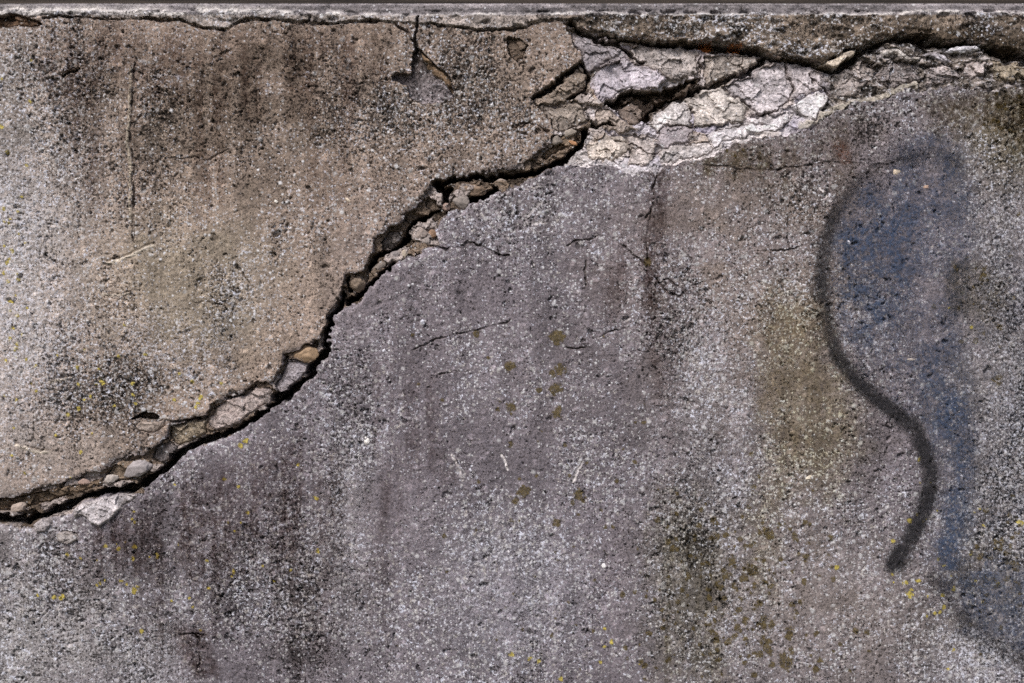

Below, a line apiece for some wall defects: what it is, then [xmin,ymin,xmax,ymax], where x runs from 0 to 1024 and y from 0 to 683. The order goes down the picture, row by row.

crack [124,61,142,242]
crack [41,14,574,105]
crack [564,173,704,298]
spalling [511,22,1024,177]
crack [746,202,803,255]
crack [689,160,895,172]
crack [0,96,591,545]
crack [565,327,626,350]